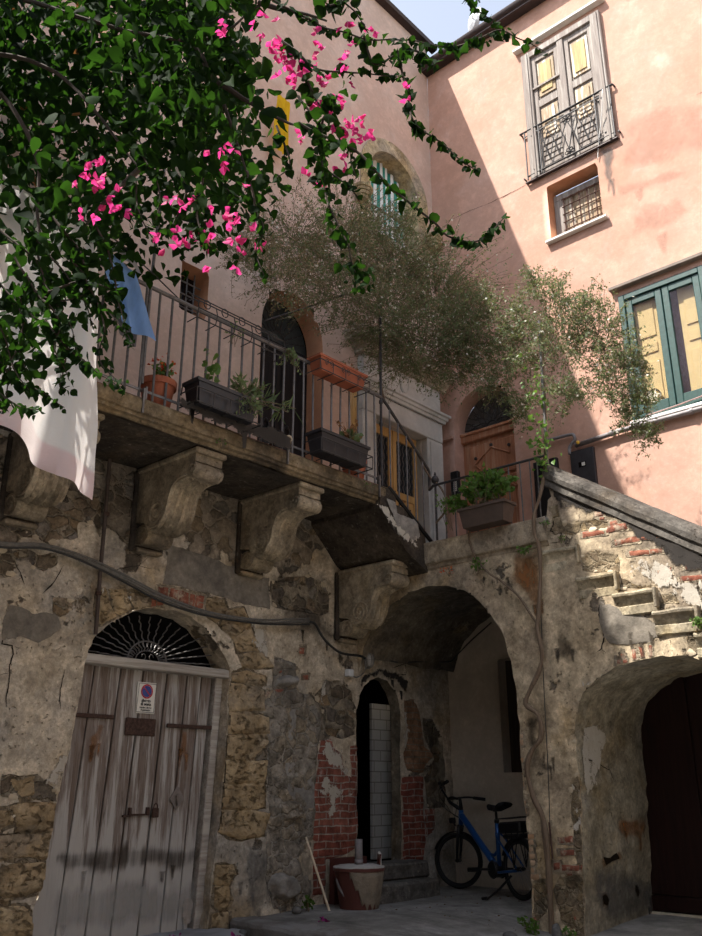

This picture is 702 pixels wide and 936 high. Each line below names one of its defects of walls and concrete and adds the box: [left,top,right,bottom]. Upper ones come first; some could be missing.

leakage [603,150,614,194]
peeling [377,504,417,547]
flaking render [549,505,702,609]
crack [1,640,22,706]
flaking render [613,640,654,666]
flaking render [686,636,697,656]
flaking render [93,584,358,912]
flaking render [401,699,446,860]
flaking render [520,732,530,817]
flaking render [0,755,68,936]
flaking render [528,725,606,936]
flaking render [208,862,239,929]